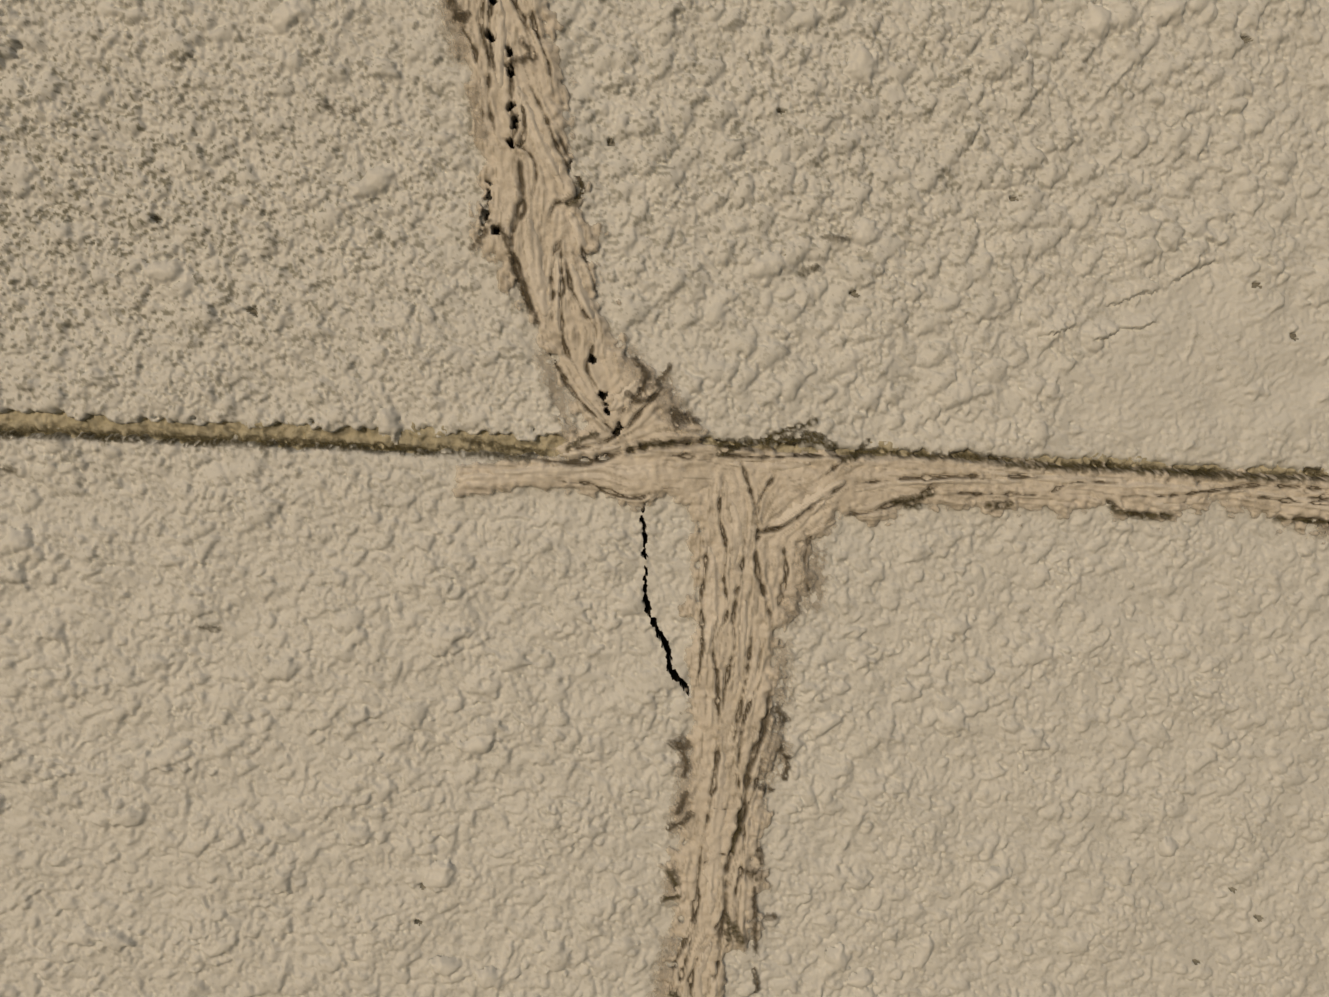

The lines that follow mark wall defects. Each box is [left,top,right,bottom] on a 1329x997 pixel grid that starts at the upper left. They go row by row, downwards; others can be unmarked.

crack [639,503,689,696]